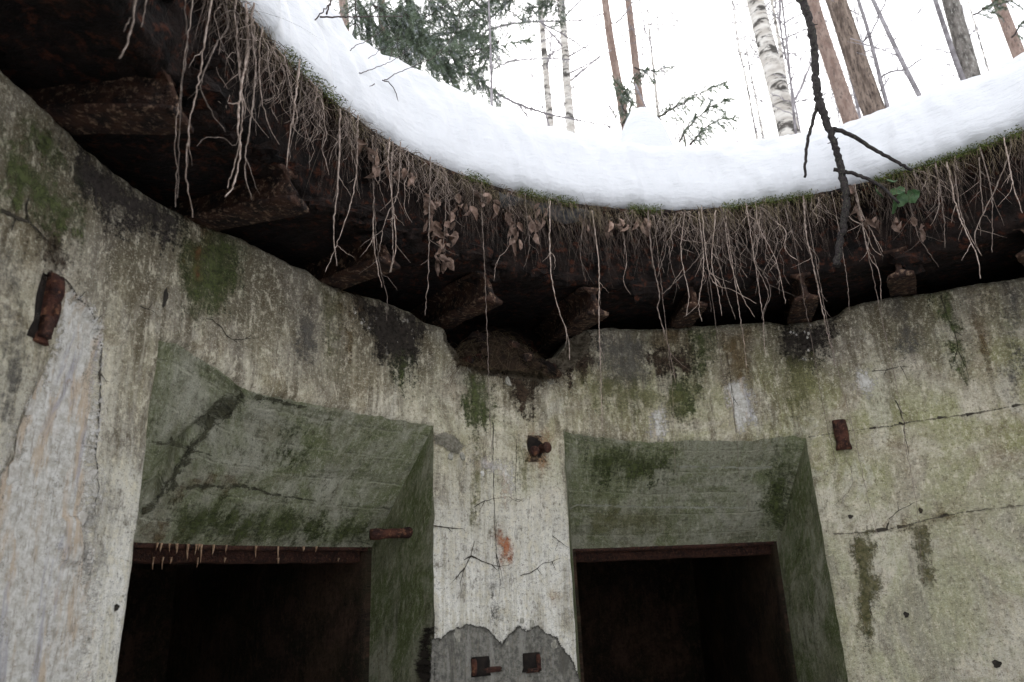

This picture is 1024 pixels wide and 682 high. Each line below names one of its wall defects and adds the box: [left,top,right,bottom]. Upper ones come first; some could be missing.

crack [142,390,316,515]
water stain [340,292,432,386]
water stain [464,399,490,441]
water stain [502,371,544,426]
water stain [555,330,706,417]
crack [874,366,909,455]
crack [434,423,567,592]
corrosion [497,531,513,562]
spalling [414,618,581,682]